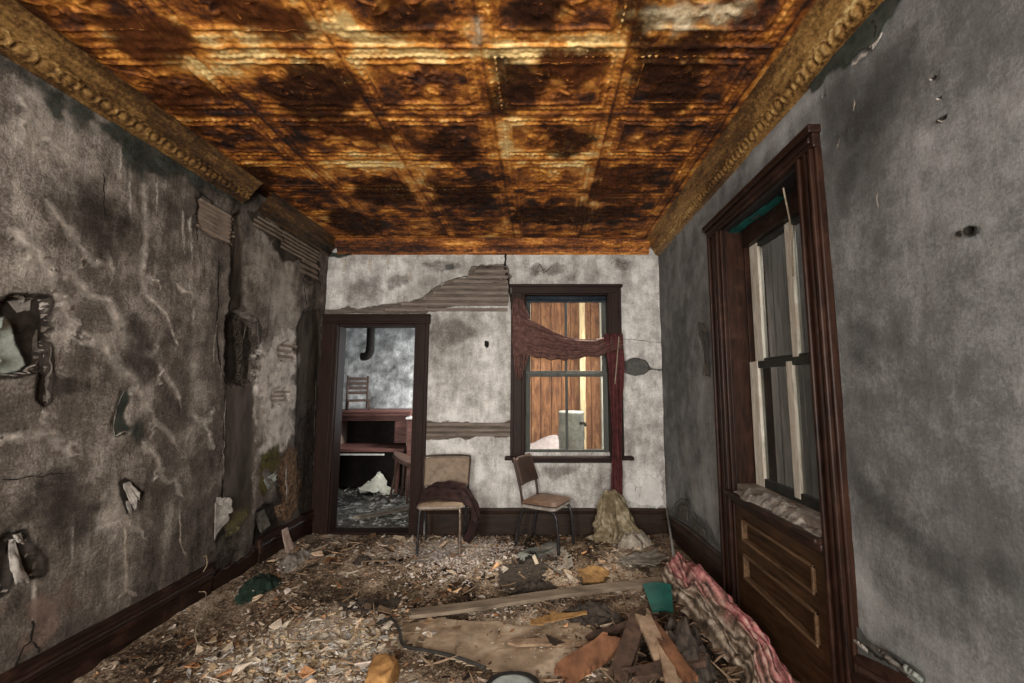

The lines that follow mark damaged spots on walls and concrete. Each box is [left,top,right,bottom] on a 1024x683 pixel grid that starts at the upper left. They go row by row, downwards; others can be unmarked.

corrosion [215,0,312,41]
corrosion [261,60,393,147]
corrosion [487,49,610,116]
corrosion [617,0,752,118]
leakage [3,62,239,349]
flaking render [325,264,512,314]
spalling [0,293,54,379]
leakage [0,199,183,496]
leakage [193,406,215,450]
flaking render [213,308,301,544]
leakage [295,309,322,514]
flaking render [426,420,510,440]